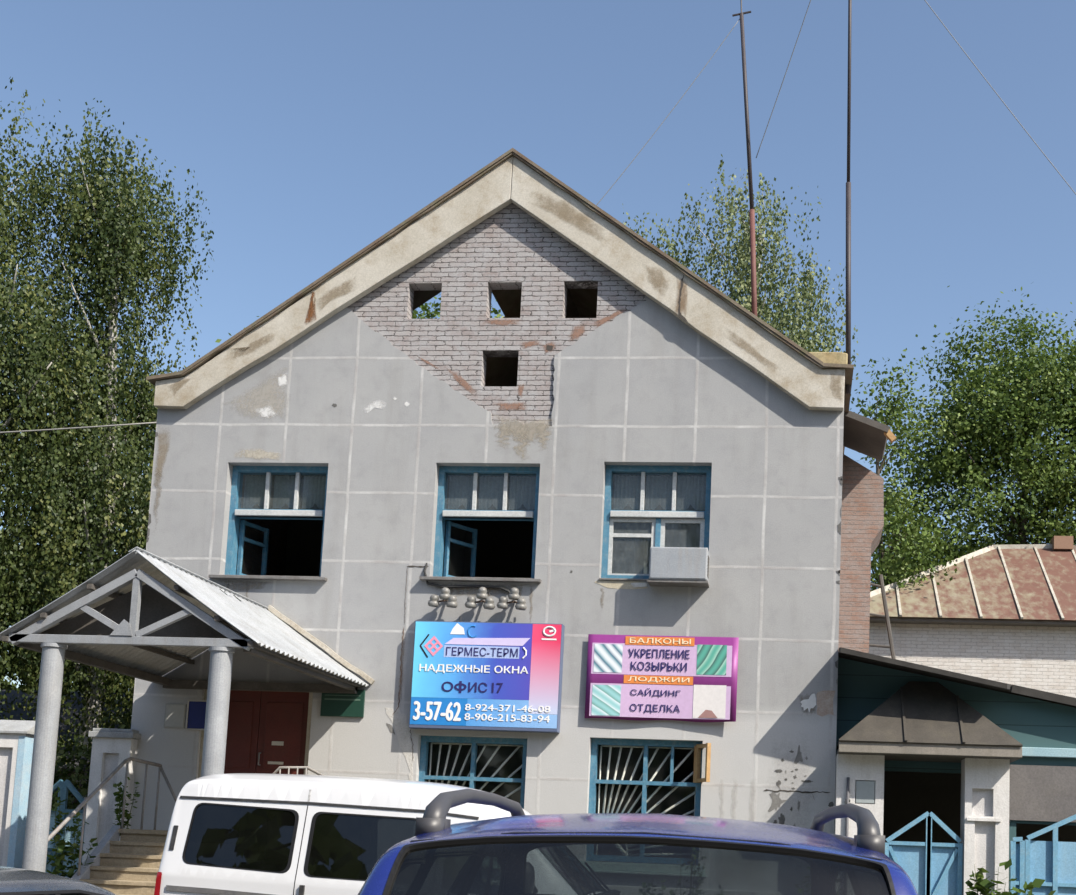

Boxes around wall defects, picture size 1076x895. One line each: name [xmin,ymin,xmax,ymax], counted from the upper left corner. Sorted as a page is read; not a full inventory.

corrosion [306,292,316,322]
spalling [525,341,555,352]
spalling [500,386,524,410]
flaking render [801,660,838,717]
peeling [768,745,813,826]